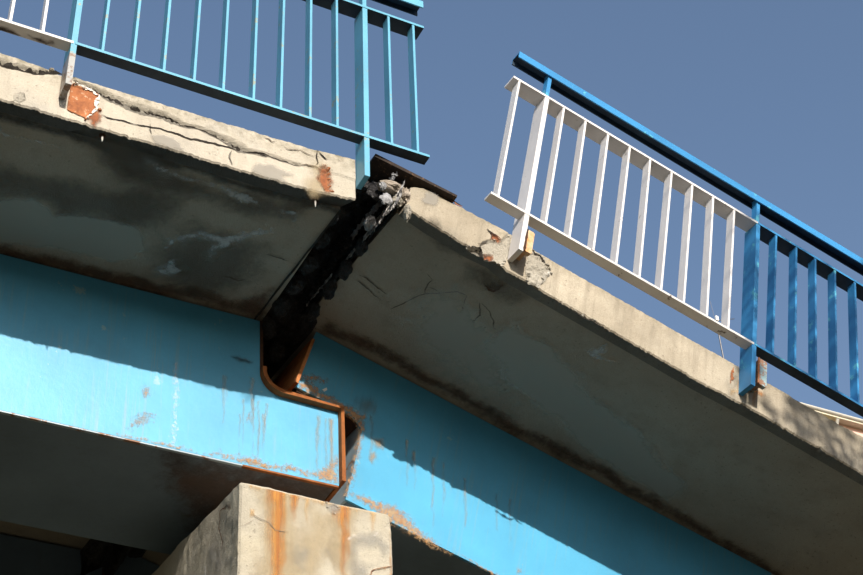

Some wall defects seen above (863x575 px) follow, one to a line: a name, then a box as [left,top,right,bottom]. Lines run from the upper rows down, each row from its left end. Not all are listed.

crack [0,62,326,168]
water stain [0,112,342,225]
water stain [160,230,264,292]
spalling [466,230,511,266]
spalling [525,249,553,288]
crack [358,273,494,348]
peeling [211,453,338,482]
peeling [299,376,365,494]
rust [324,324,779,575]
rust [169,452,332,575]
peeling [358,496,435,546]